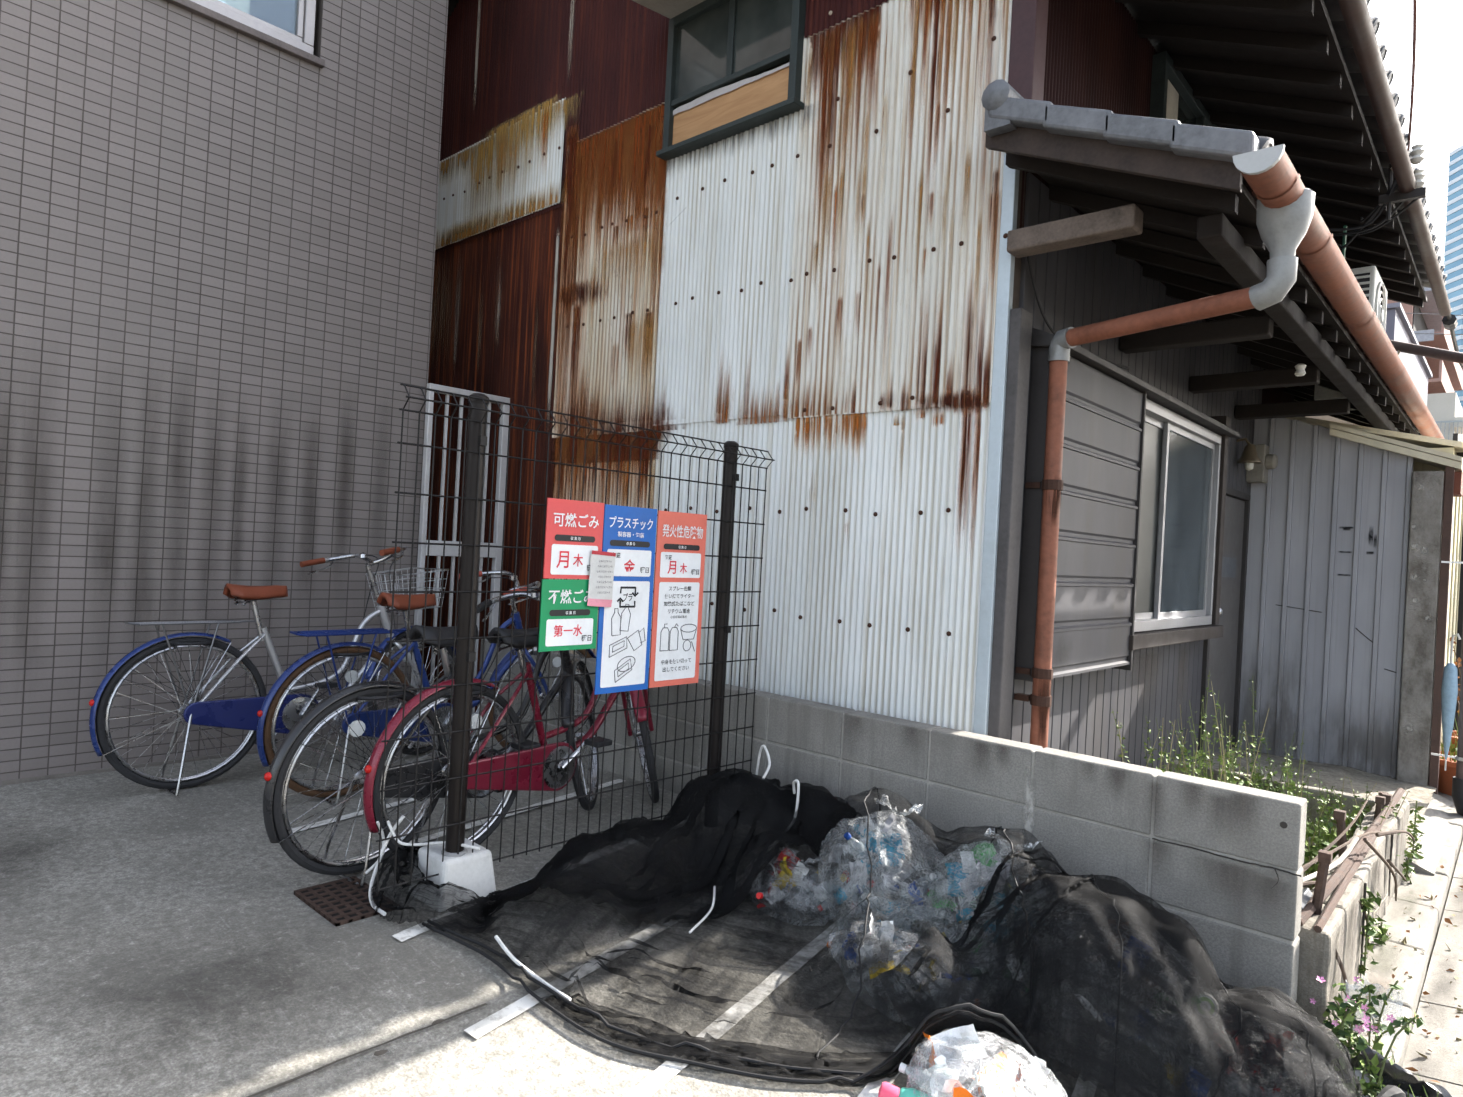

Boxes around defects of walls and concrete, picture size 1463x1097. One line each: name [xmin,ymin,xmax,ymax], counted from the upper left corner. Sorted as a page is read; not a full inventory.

rust [436,96,677,504]
rust [805,6,887,261]
rust [836,231,890,319]
rust [919,182,933,221]
rust [910,0,1005,143]
rust [949,150,970,192]
rust [977,171,999,262]
rust [716,307,990,525]